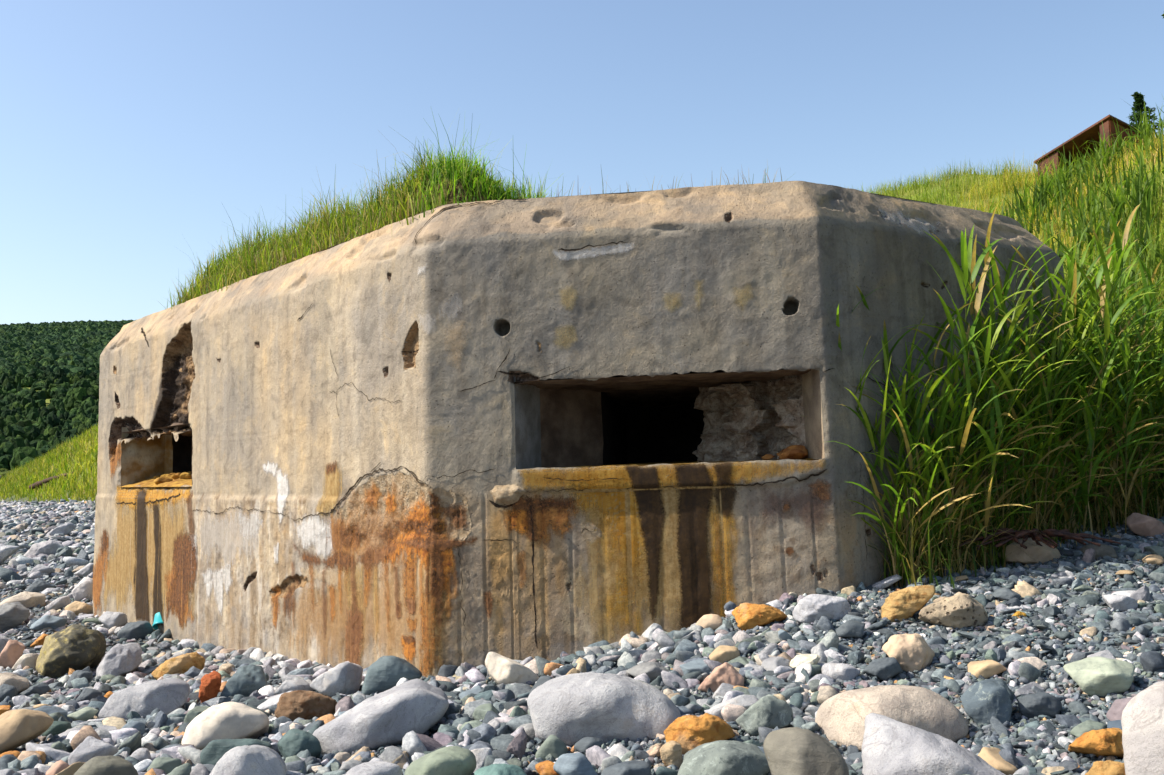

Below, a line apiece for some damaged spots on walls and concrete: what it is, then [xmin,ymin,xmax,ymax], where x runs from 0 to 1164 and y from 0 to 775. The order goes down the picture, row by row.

spalling [108,322,195,461]
spalling [401,321,419,370]
crack [459,349,570,392]
crack [117,463,496,521]
corrosion [93,530,109,616]
corrosion [165,494,197,626]
corrosion [271,461,477,677]
corrosion [504,495,578,587]